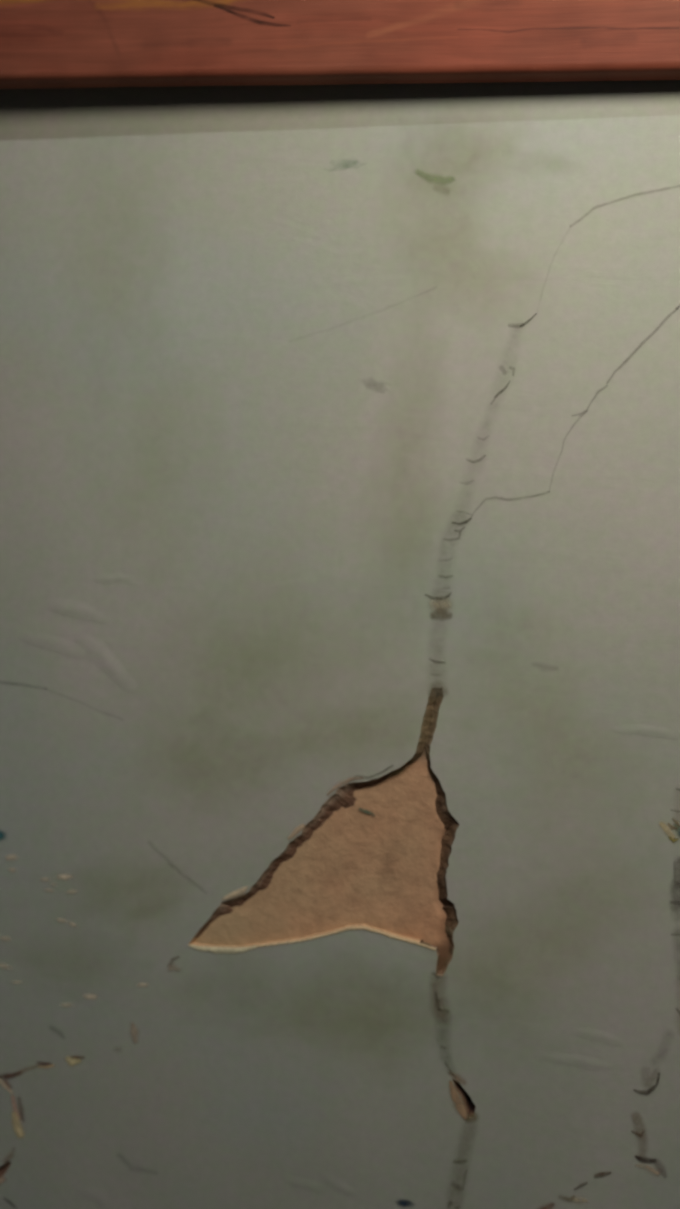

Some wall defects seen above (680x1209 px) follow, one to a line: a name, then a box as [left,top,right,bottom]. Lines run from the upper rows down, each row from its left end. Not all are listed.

crack [432,596,450,618]
crack [408,688,444,764]
peeling [188,747,459,971]
crack [422,925,455,976]
crack [449,1075,476,1119]
crack [634,1132,656,1171]
crack [541,1172,611,1209]